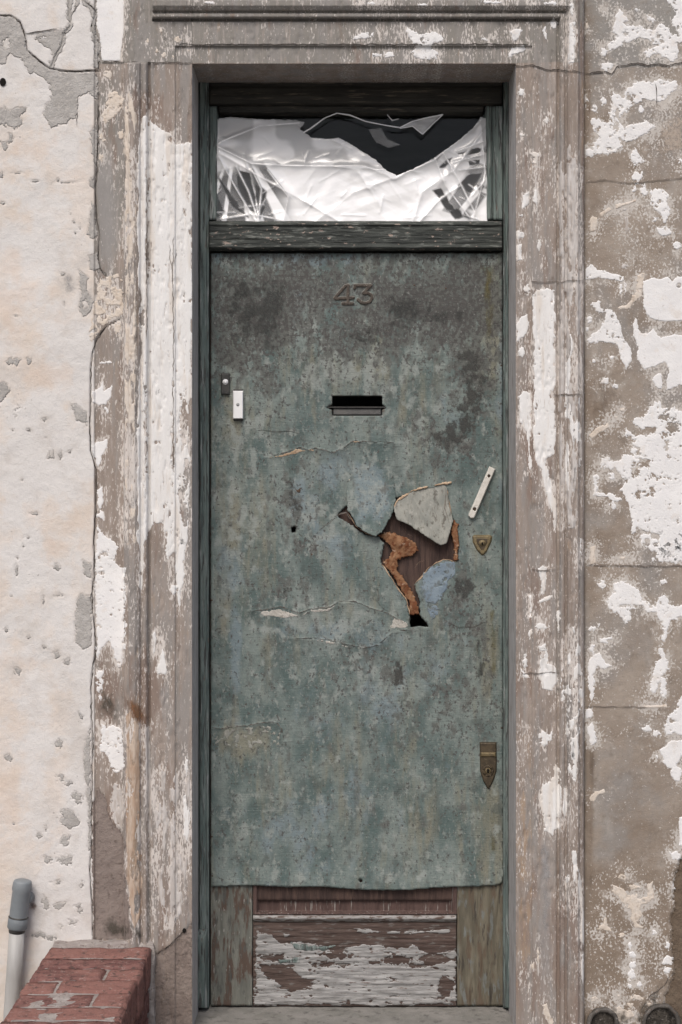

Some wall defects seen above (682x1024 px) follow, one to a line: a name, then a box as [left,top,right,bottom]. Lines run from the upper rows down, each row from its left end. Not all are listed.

crack [0,5,682,104]
peeling [601,0,682,71]
peeling [0,0,192,701]
peeling [516,79,682,564]
crack [259,576,409,647]
peeling [391,618,408,628]
peeling [420,561,455,620]
peeling [521,565,612,836]
peeling [597,579,682,782]
peeling [252,928,457,1007]